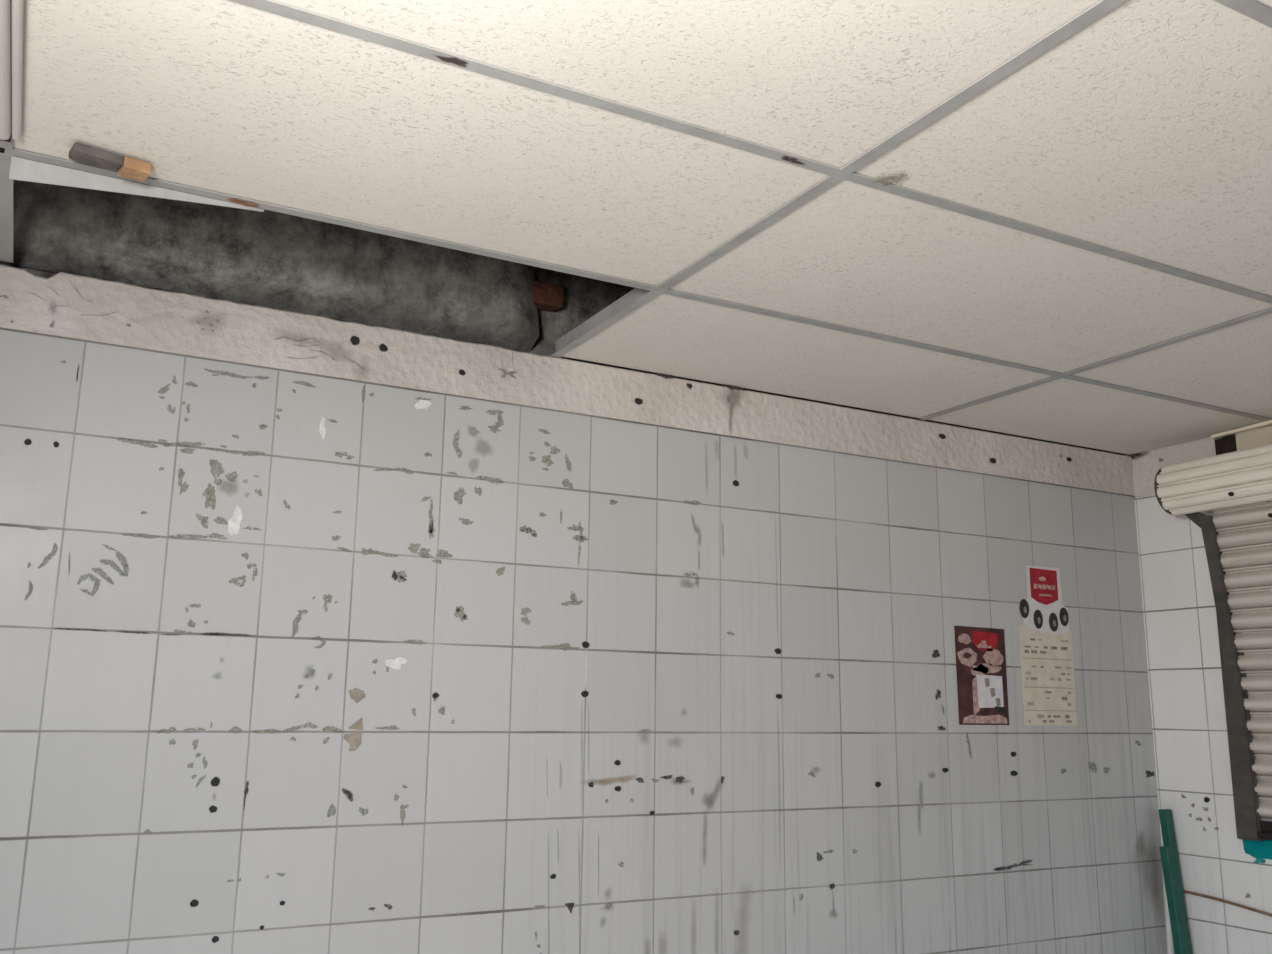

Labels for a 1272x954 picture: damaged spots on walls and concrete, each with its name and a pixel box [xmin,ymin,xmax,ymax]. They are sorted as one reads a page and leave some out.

corrosion [229,199,259,207]
peeling [158,377,197,422]
peeling [453,410,503,469]
peeling [528,429,573,488]
peeling [197,434,262,539]
peeling [408,496,452,564]
peeling [454,487,482,525]
peeling [540,511,586,563]
peeling [69,545,128,596]
peeling [229,553,257,587]
spalling [349,688,365,703]
spalling [344,718,363,751]